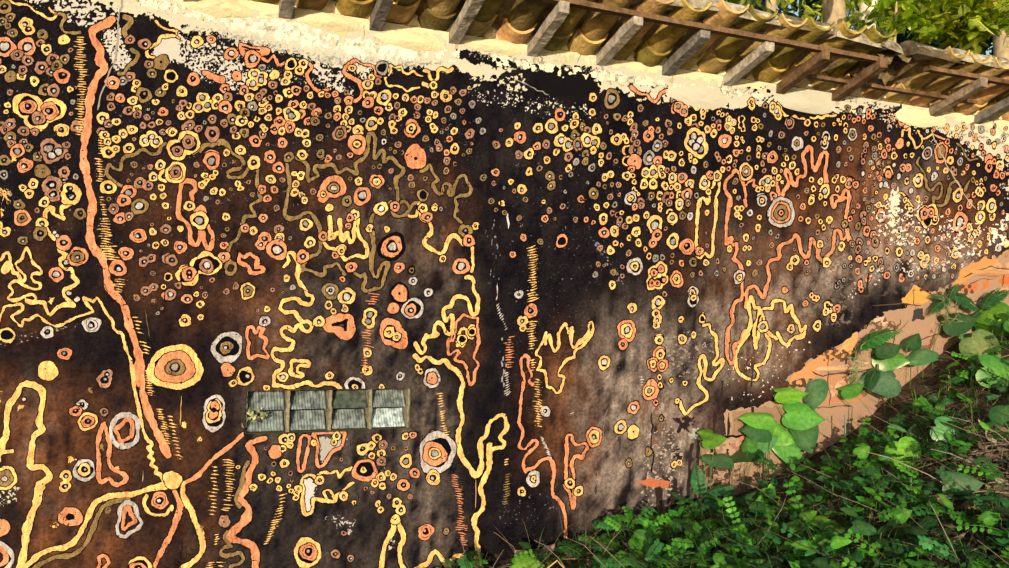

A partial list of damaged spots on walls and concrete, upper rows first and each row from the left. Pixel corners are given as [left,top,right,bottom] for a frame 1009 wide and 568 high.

flaking render [25,0,927,122]
flaking render [931,112,1009,168]
peeling [664,325,722,379]
flaking render [786,250,1009,462]
flaking render [640,401,790,513]